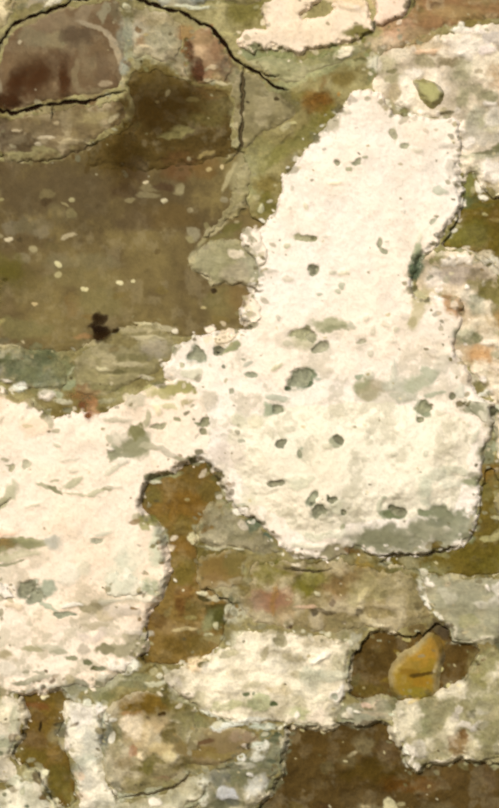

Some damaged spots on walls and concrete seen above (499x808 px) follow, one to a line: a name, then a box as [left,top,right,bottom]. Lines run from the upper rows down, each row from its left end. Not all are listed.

crack [0,0,87,44]
crack [0,92,121,121]
crack [138,0,288,163]
peeling [163,89,499,577]
peeling [0,379,232,807]
spalling [350,623,479,700]
spalling [260,723,499,808]